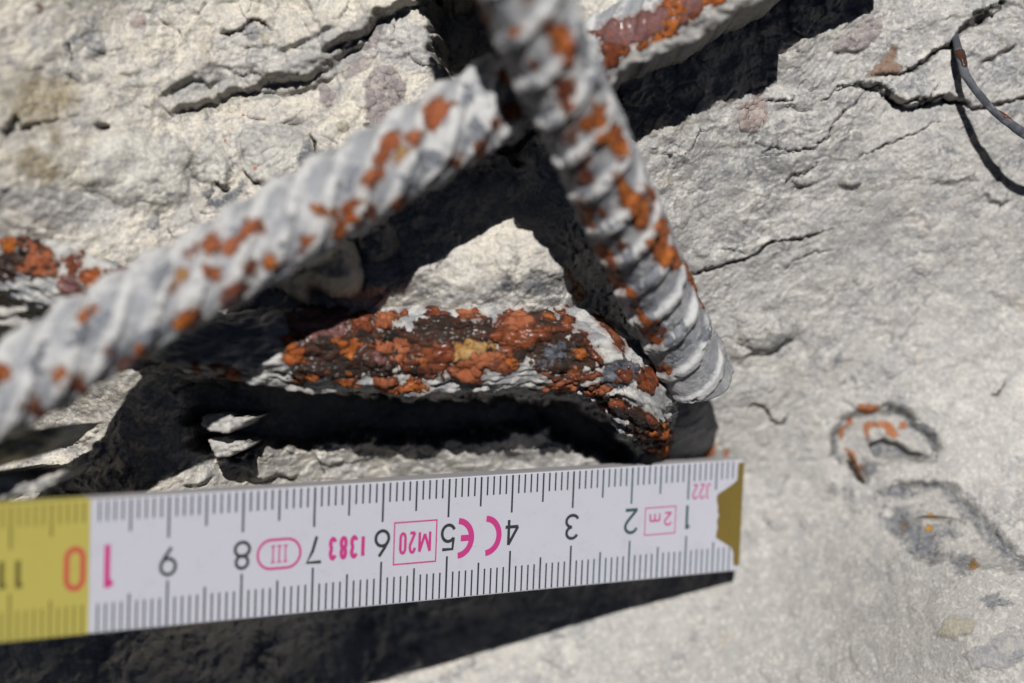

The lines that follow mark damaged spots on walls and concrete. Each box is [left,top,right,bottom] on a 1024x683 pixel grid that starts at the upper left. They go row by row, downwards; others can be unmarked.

crack [764,2,1024,184]
spalling [0,0,881,463]
corrosion [564,265,588,302]
crack [692,229,834,275]
corrosion [839,404,906,483]